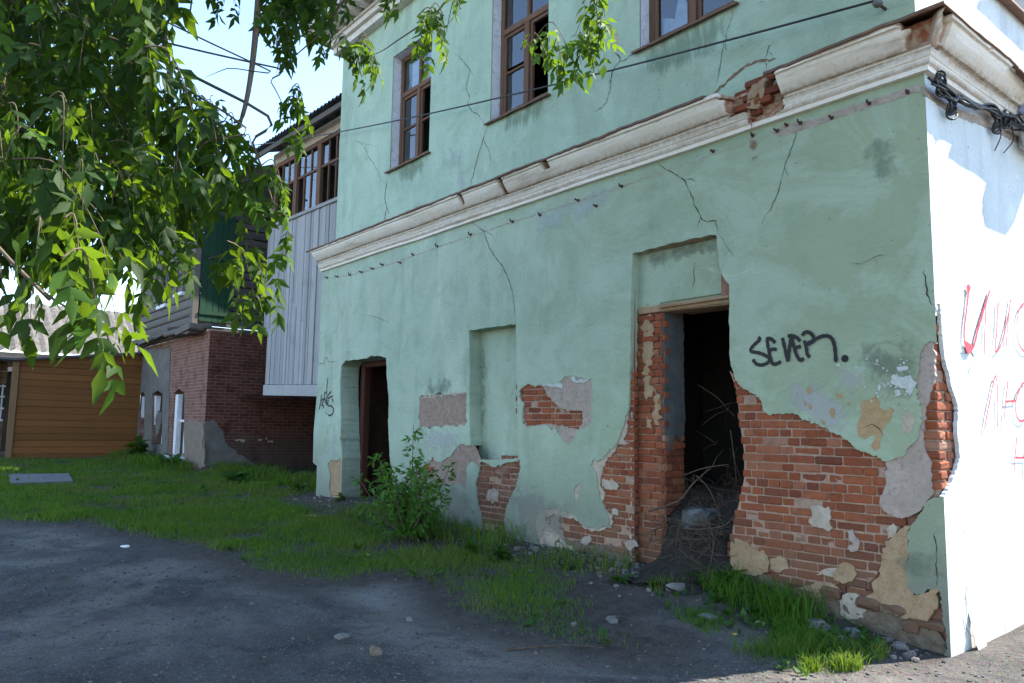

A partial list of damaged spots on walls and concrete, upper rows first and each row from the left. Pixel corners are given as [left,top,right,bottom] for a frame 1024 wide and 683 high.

crack [461,59,491,178]
crack [659,164,730,251]
crack [761,126,803,224]
peeling [182,419,206,469]
peeling [419,392,467,428]
flaking render [415,444,521,535]
flaking render [515,376,593,444]
flaking render [535,333,639,562]
flaking render [727,303,956,655]